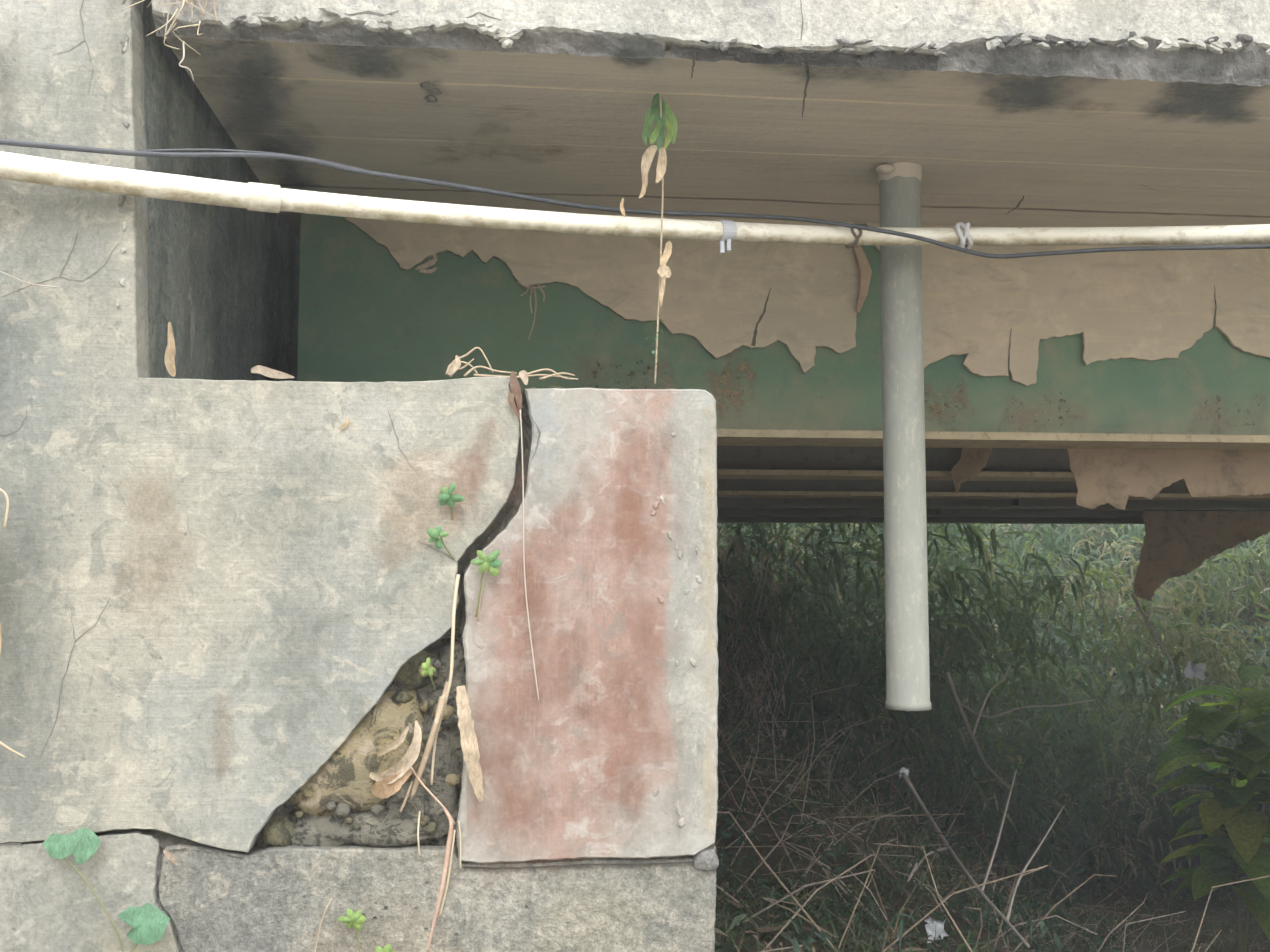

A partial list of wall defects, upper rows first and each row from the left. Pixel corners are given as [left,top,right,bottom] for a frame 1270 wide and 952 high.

spalling [152,8,1270,87]
crack [800,0,810,117]
peeling [596,214,880,227]
peeling [345,217,880,373]
peeling [922,244,1270,387]
crack [416,386,541,643]
crack [0,839,44,847]
crack [95,829,264,952]